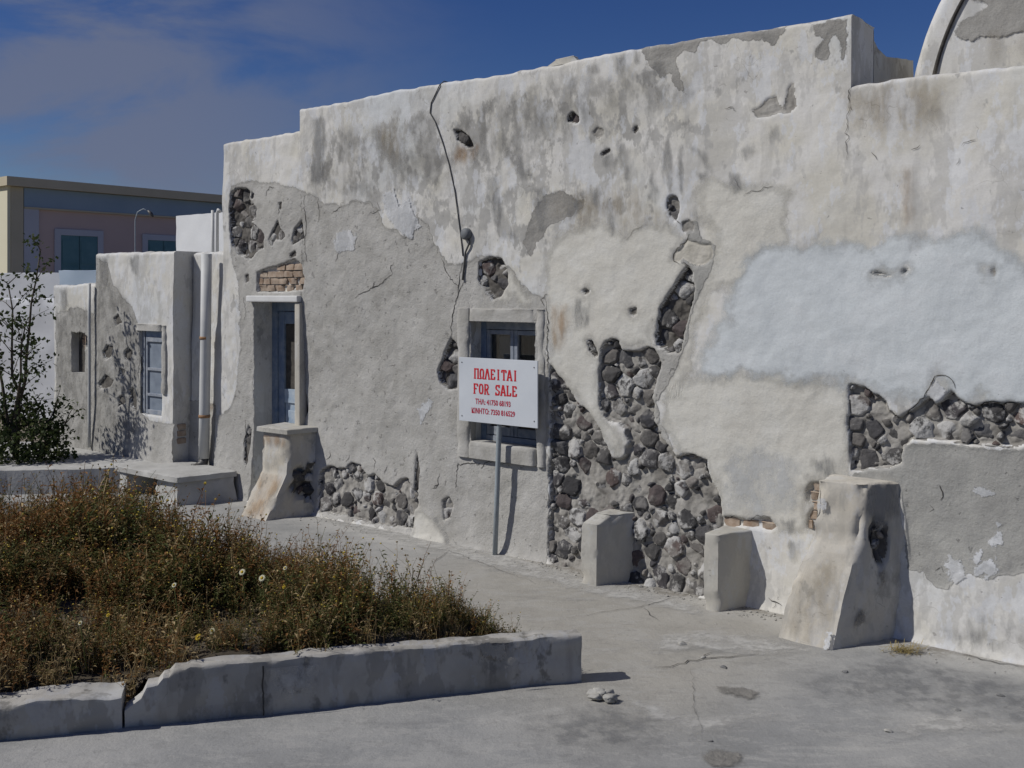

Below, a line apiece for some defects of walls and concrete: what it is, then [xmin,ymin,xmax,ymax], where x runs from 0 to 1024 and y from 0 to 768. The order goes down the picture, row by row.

flaking render [642,28,785,91]
flaking render [813,19,848,60]
crack [443,262,466,335]
flaking render [52,177,790,597]
flaking render [847,385,1024,590]